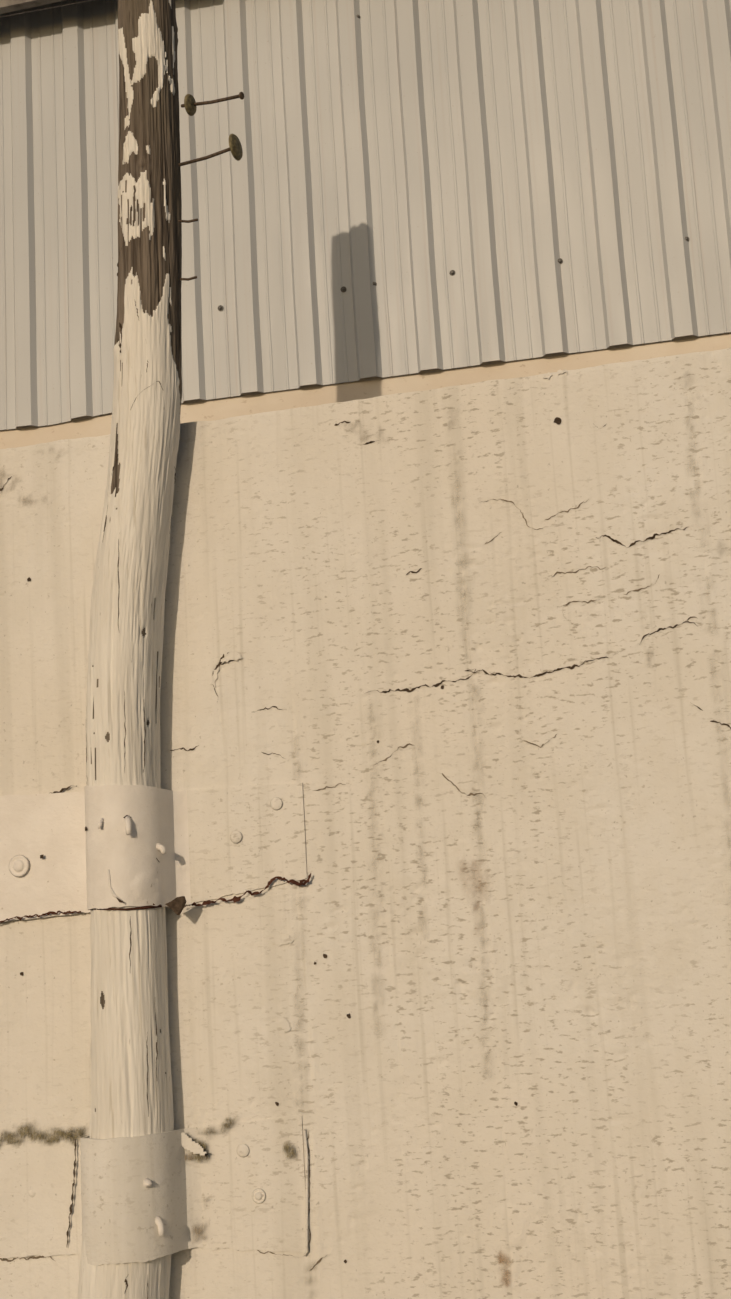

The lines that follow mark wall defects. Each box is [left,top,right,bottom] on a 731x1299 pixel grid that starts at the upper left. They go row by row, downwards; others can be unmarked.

peeling [118,0,175,261]
crack [481,499,589,544]
crack [552,526,692,616]
crack [369,617,698,693]